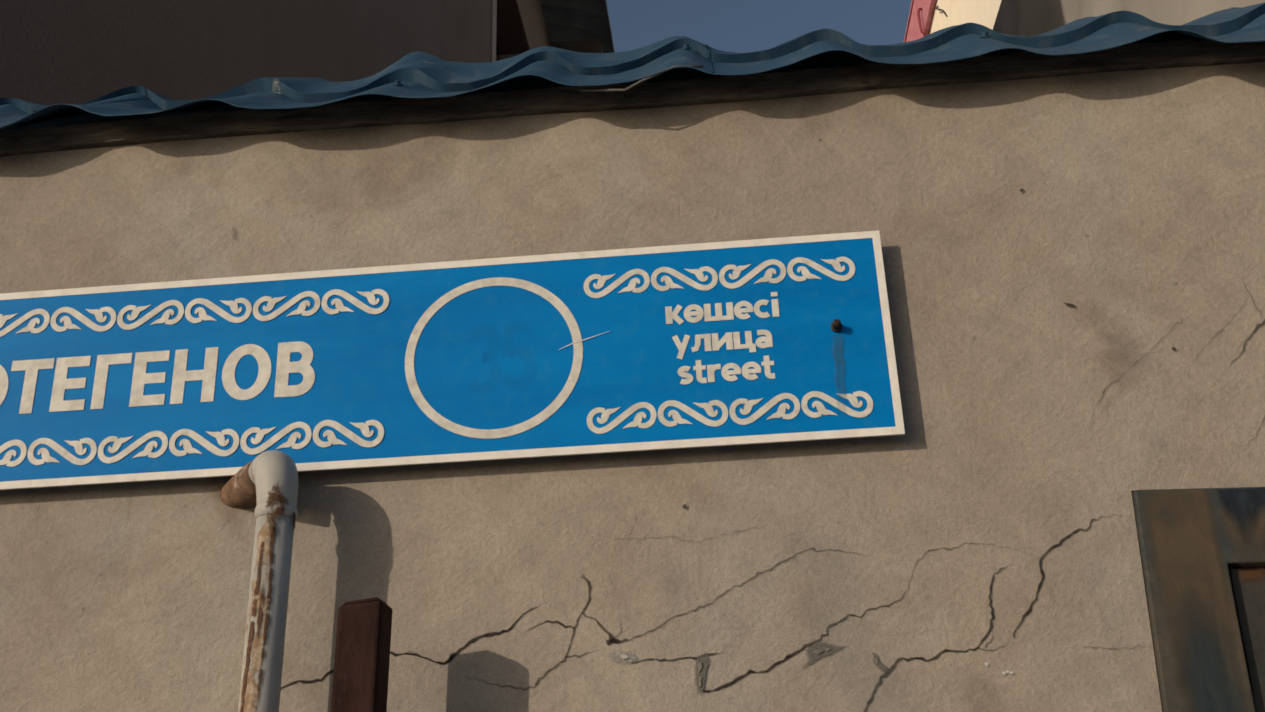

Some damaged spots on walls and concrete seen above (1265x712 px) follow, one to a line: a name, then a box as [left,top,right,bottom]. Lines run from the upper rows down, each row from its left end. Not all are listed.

crack [1244,320,1265,345]
corrosion [239,484,296,712]
crack [281,670,334,689]
crack [390,548,813,690]
crack [703,596,904,693]
crack [863,519,1097,712]